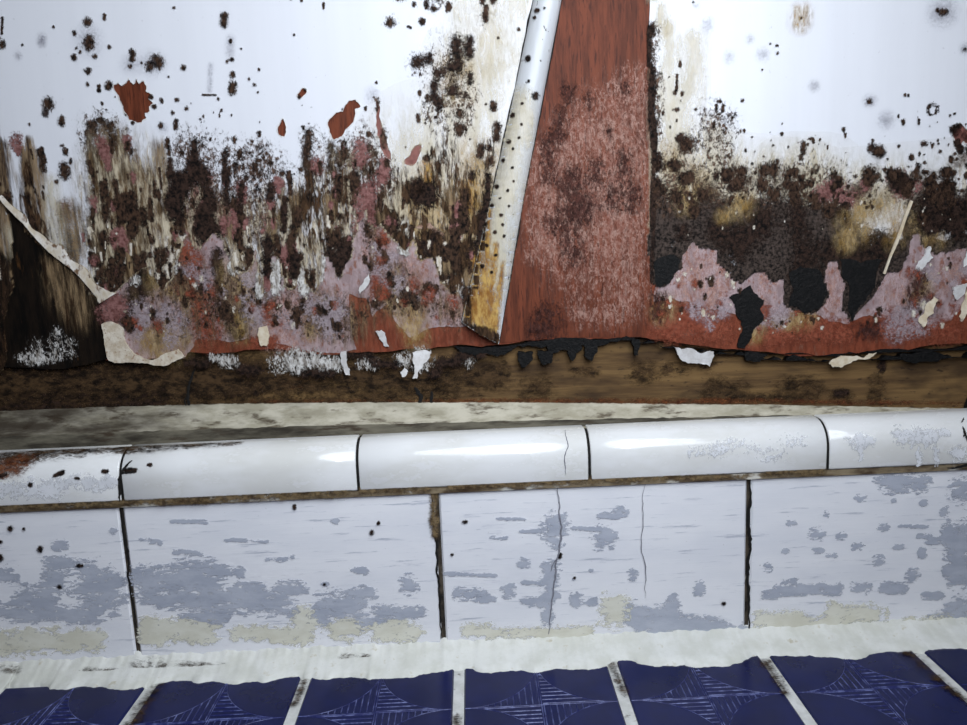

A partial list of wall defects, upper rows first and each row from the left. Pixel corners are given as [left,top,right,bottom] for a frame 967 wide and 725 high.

leakage [0,0,967,411]
peeling [915,246,933,272]
peeling [918,297,938,327]
peeling [257,326,270,346]
peeling [340,351,350,375]
peeling [400,350,431,379]
crack [959,399,967,440]
peeling [443,504,630,627]
crack [548,433,569,634]
peeling [760,472,967,620]
peeling [0,540,427,634]
peeling [623,593,751,633]